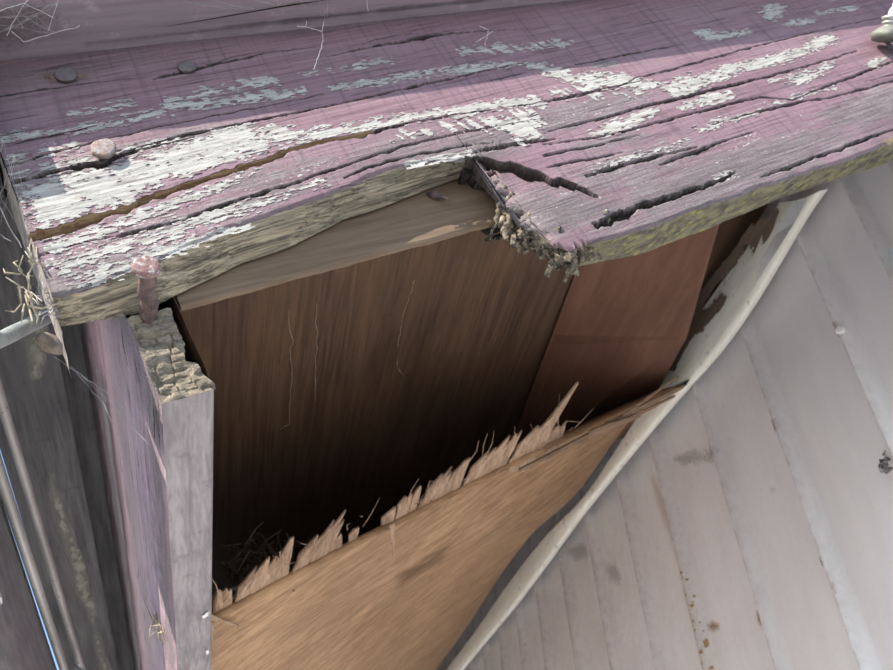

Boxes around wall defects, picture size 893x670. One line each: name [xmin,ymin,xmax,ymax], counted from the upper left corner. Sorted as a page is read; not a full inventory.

peeling [691,28,752,41]
peeling [757,0,859,27]
peeling [865,57,888,68]
crack [541,19,893,178]
crack [112,130,496,239]
spalling [0,33,840,327]
crack [598,193,692,229]
peeling [669,209,779,371]
corrosion [692,620,718,669]